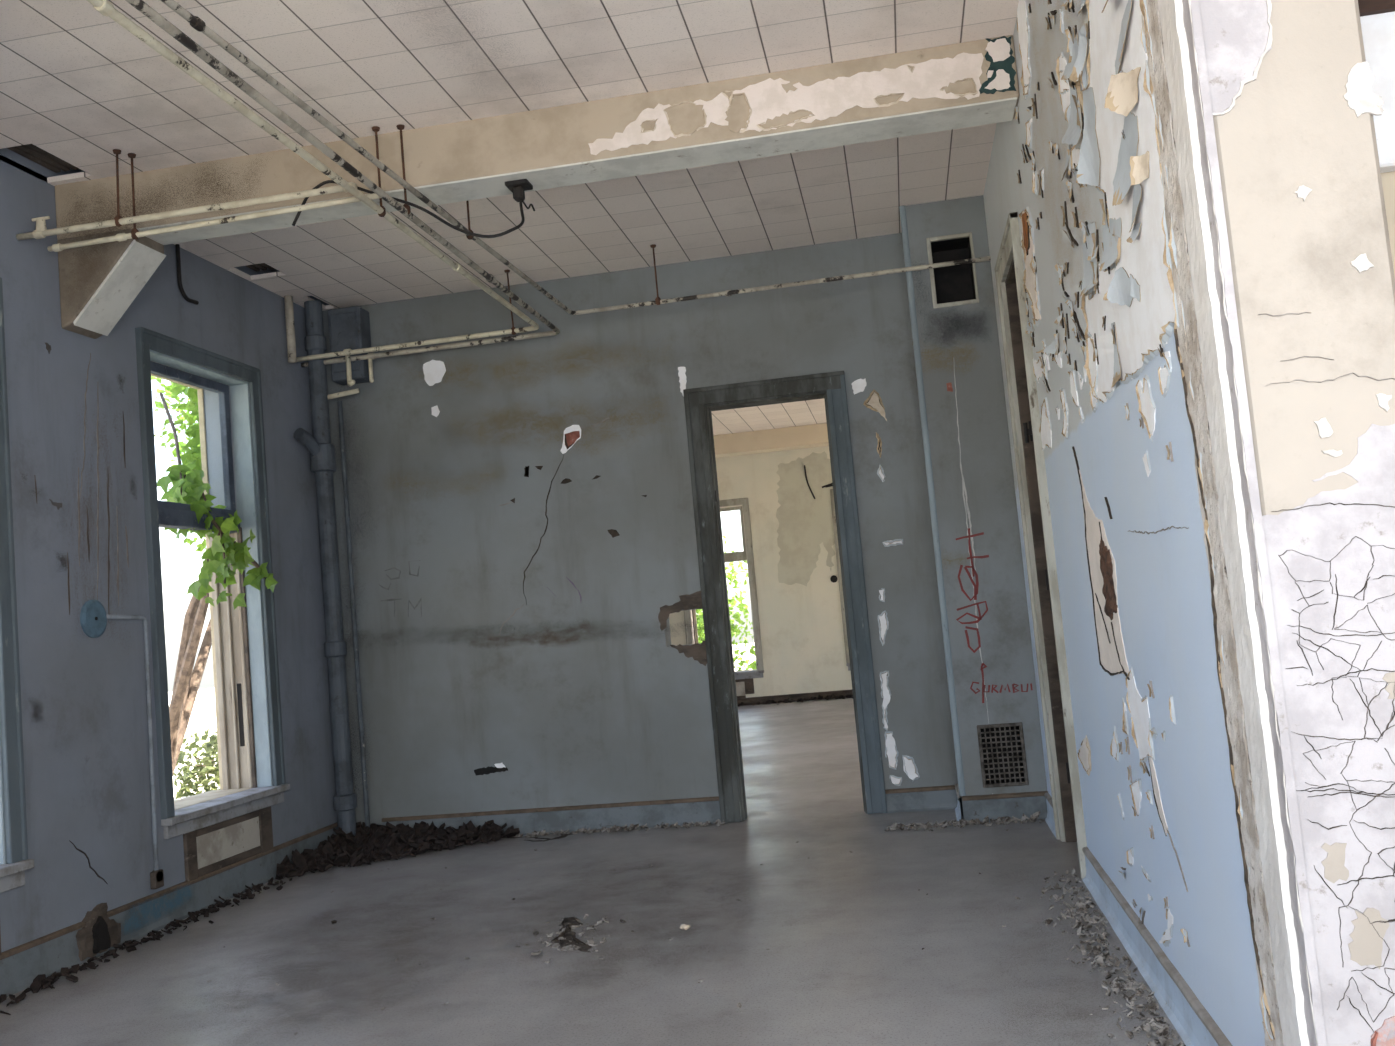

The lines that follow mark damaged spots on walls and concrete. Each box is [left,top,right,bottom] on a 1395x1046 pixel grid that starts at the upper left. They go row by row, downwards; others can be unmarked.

spalling [560,425,581,454]
peeling [588,0,1189,839]
peeling [1119,847,1190,947]
crack [1127,0,1275,1041]
spalling [1187,0,1272,325]
crack [1272,503,1395,1032]